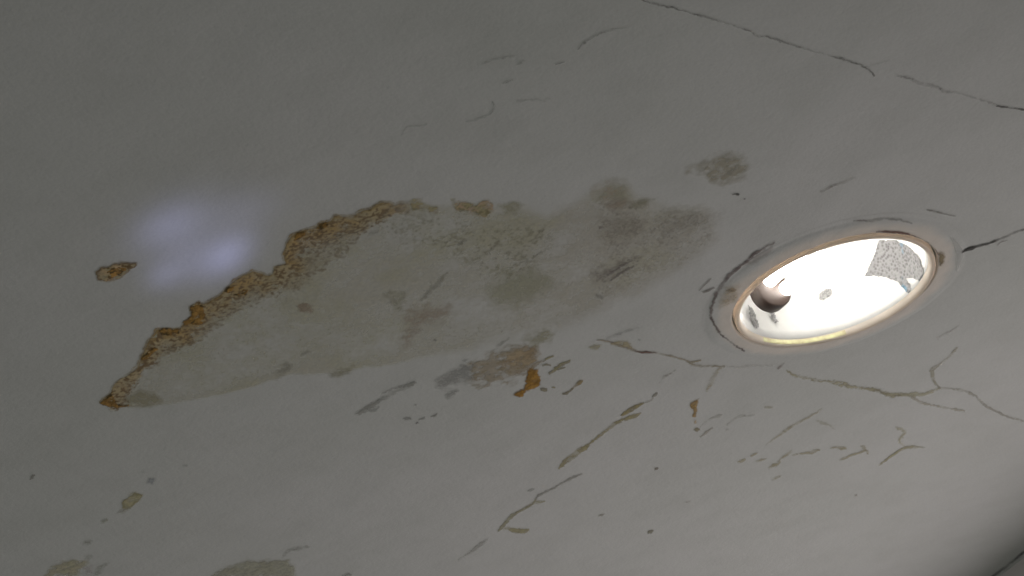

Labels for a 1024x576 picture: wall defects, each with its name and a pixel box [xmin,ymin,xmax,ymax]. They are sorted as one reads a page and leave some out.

crack [858,220,1024,254]
water stain [96,201,444,411]
crack [699,243,774,352]
water stain [439,332,547,397]
rust [514,369,541,397]
crack [590,340,719,367]
crack [788,369,1018,420]
water stain [559,393,658,469]